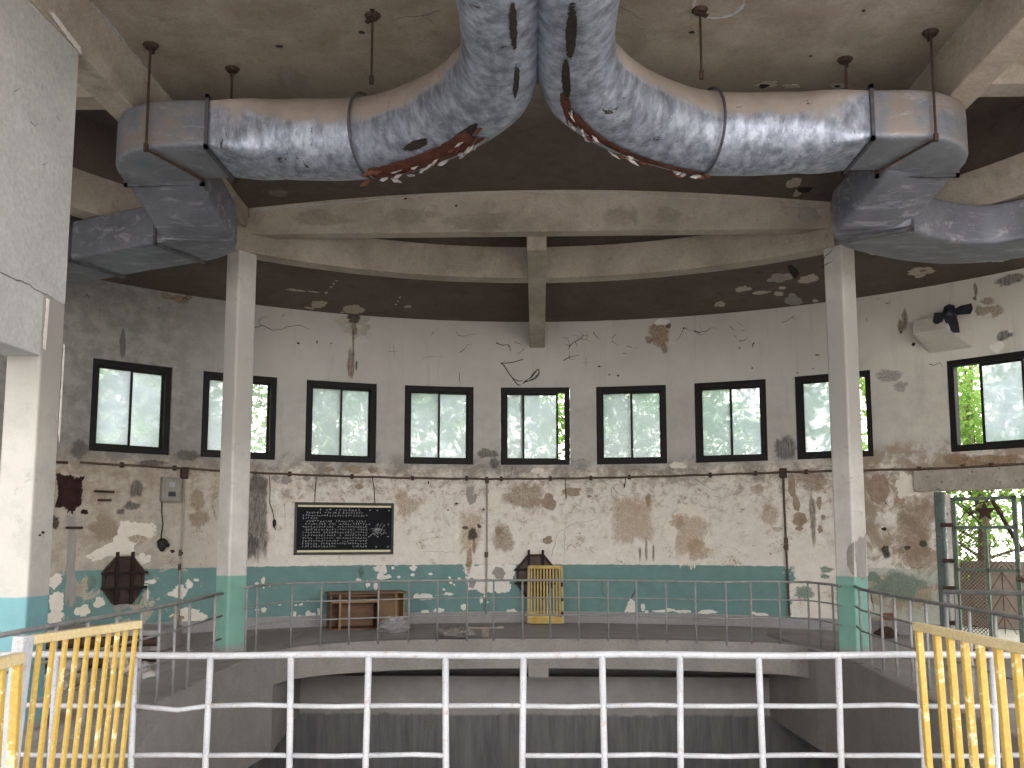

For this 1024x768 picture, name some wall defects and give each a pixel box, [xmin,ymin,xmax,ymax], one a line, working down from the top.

spalling [735,265,819,305]
damp [347,314,360,377]
flaking render [55,473,88,514]
damp [249,474,266,491]
peeling [84,520,157,566]
damp [247,536,257,557]
damp [617,495,712,570]
peeling [47,573,157,624]
peeling [413,562,516,613]